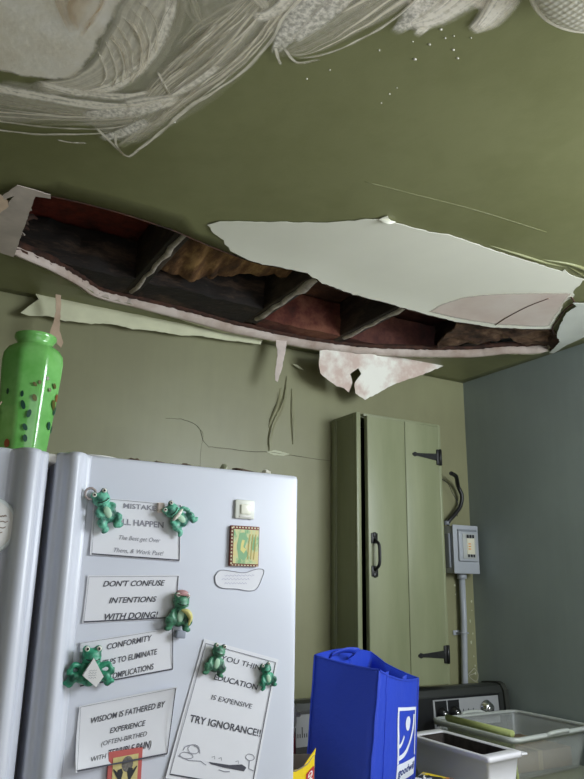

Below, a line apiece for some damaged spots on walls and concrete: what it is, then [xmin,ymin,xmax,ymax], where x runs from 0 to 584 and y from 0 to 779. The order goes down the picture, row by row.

peeling [14,196,584,358]
crack [167,418,329,461]